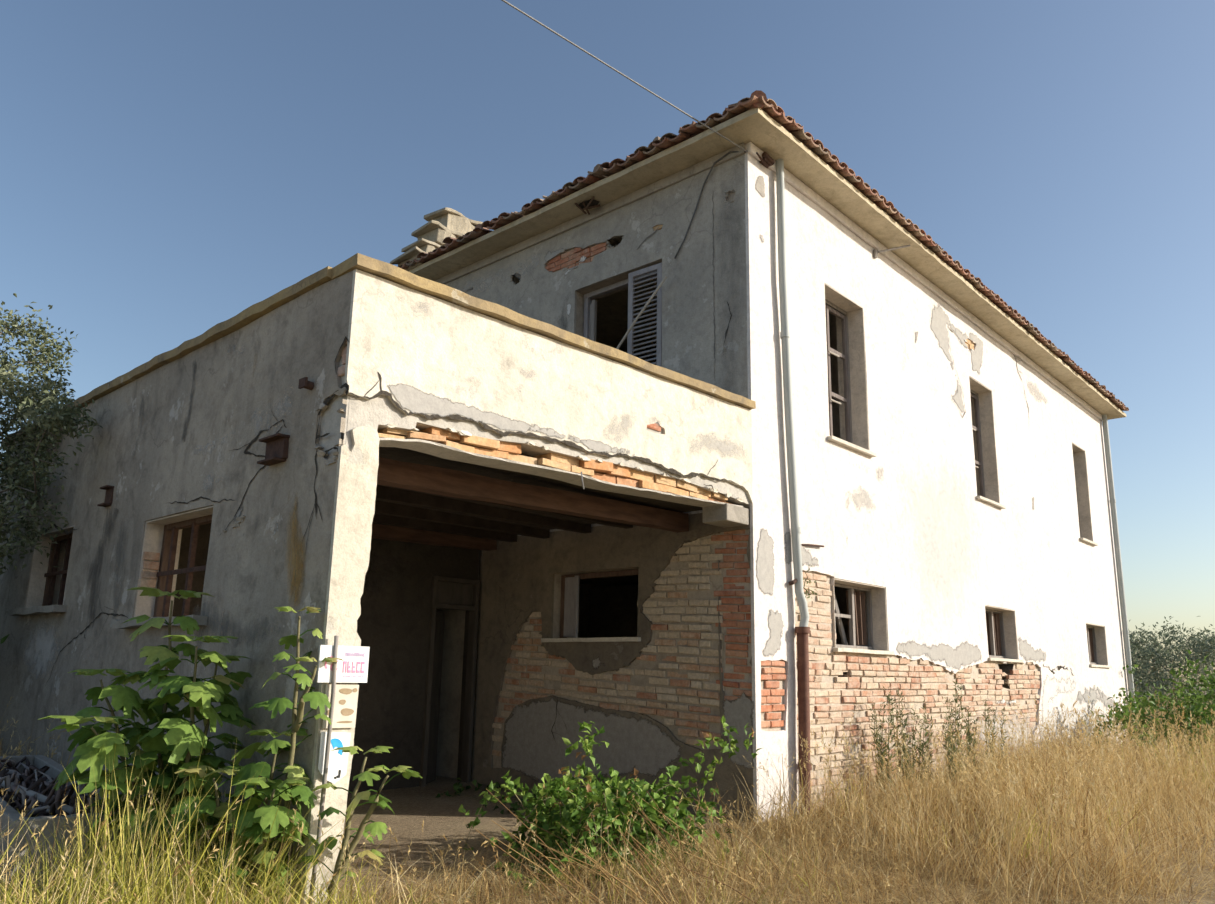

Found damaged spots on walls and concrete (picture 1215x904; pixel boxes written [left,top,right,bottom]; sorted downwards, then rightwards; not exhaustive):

spalling [543,236,624,274]
spalling [315,336,349,414]
spalling [915,304,983,418]
spalling [314,432,343,465]
spalling [377,384,743,507]
crack [47,597,128,682]
spalling [492,529,1120,809]